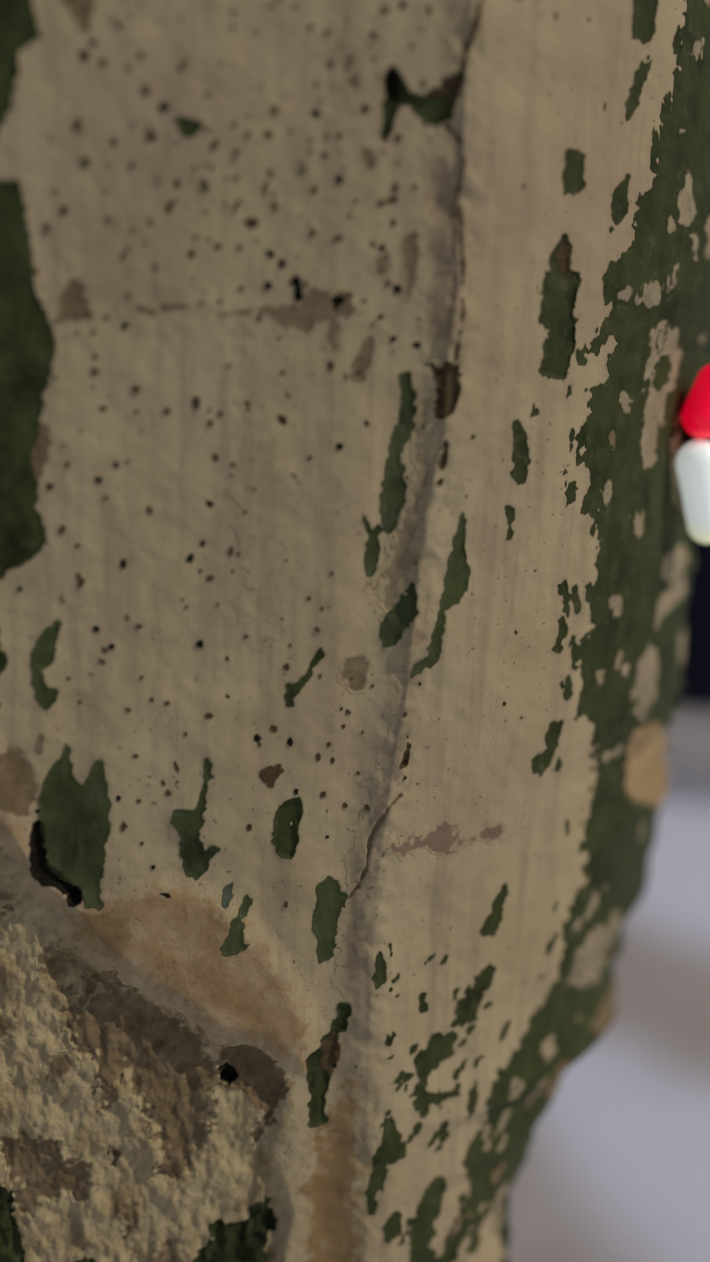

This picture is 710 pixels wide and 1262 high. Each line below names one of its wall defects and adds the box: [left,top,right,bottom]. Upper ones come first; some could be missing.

peeling [0,0,42,124]
peeling [158,102,204,138]
peeling [328,56,466,172]
crack [460,0,482,74]
crack [444,122,467,361]
peeling [0,178,95,579]
peeling [322,314,384,381]
peeling [30,596,71,710]
peeling [283,627,325,707]
peeling [362,0,710,1262]
crack [346,792,403,901]
flaking render [0,733,352,1262]